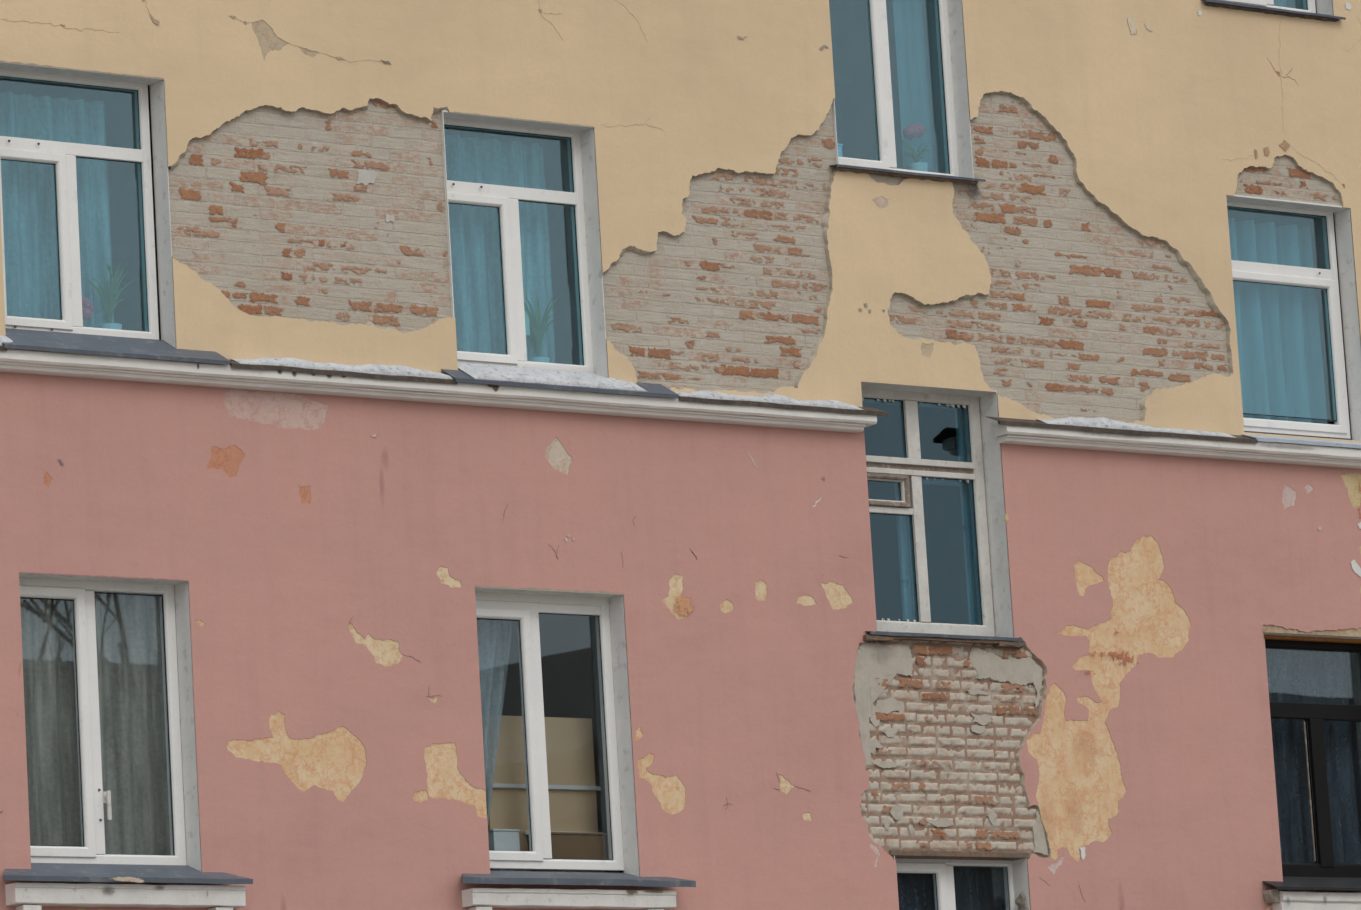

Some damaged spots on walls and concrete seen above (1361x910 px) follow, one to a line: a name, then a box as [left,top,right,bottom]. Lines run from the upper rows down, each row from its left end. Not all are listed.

spalling [1234,140,1345,207]
spalling [168,98,452,333]
spalling [602,104,837,393]
spalling [859,91,1233,423]
peeling [1341,473,1361,509]
peeling [348,623,403,667]
peeling [662,574,688,620]
peeling [1262,624,1361,639]
spalling [853,536,1191,875]
peeling [225,711,367,802]
peeling [413,742,487,818]
peeling [637,753,686,814]